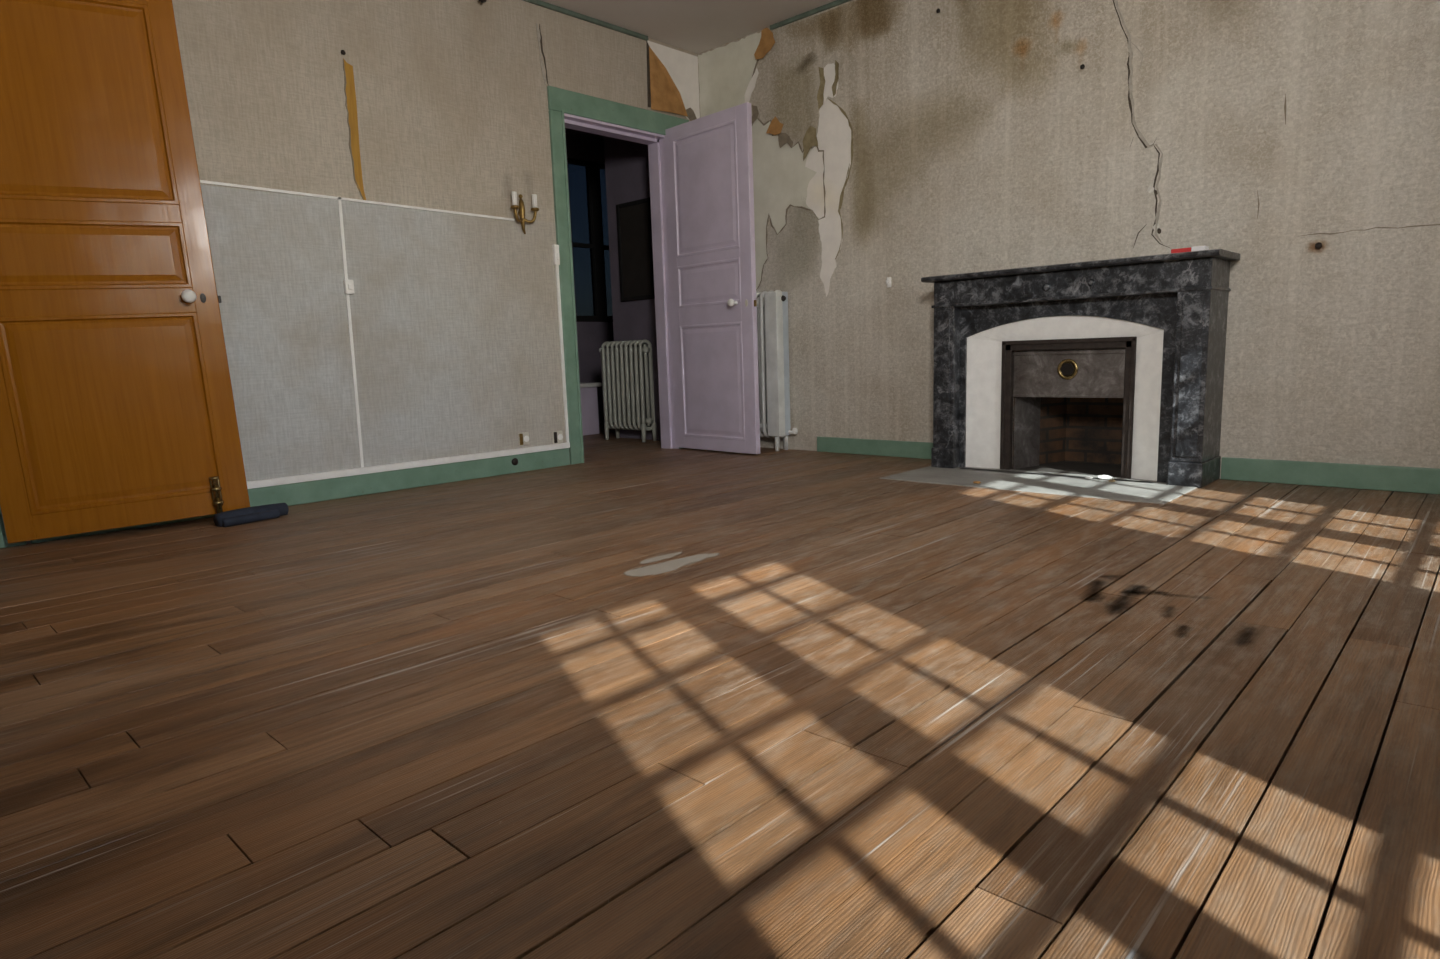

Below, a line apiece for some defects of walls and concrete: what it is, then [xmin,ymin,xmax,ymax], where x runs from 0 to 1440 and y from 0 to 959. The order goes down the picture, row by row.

flaking render [647,32,761,119]
flaking render [752,117,819,292]
crack [1113,0,1170,248]